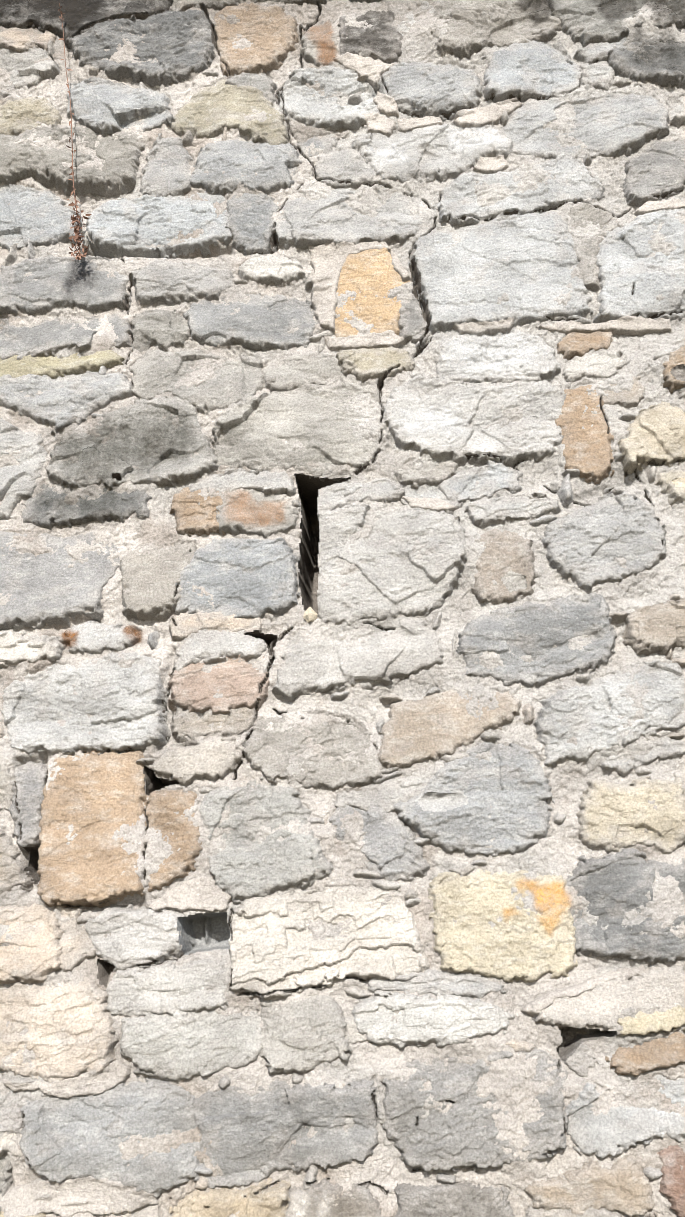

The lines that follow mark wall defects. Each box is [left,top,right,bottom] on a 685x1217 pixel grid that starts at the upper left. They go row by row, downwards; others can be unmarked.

crack [253,2,685,475]